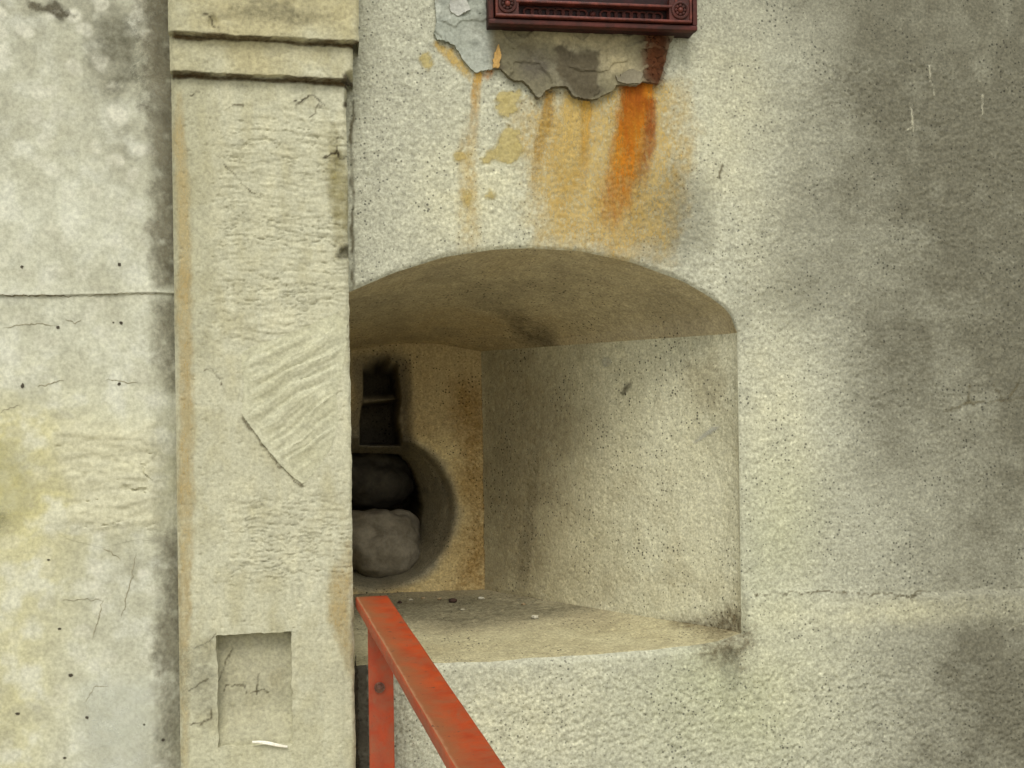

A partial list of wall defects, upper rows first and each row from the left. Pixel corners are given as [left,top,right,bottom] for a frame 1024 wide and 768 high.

peeling [433,0,674,164]
rust [521,35,682,256]
crack [242,418,305,487]